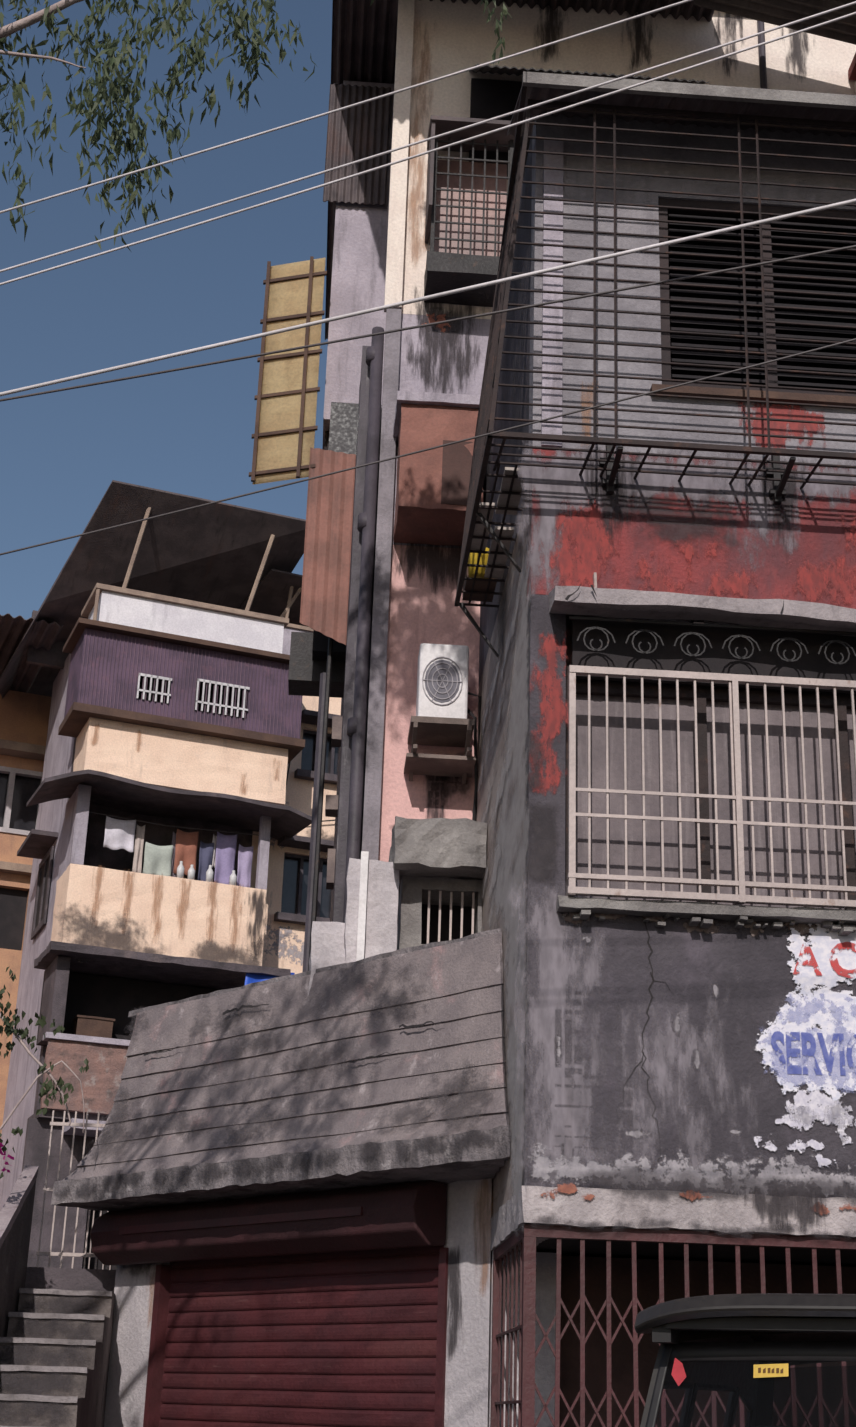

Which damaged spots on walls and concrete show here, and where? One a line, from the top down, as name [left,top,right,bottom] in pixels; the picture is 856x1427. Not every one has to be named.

leakage [716,13,743,74]
leakage [782,29,808,77]
leakage [408,297,478,393]
peeling [549,501,620,587]
peeling [636,541,717,594]
peeling [708,571,758,599]
peeling [793,516,856,606]
leakage [61,908,155,953]
leakage [196,891,269,966]
leakage [397,806,856,1228]
crack [616,918,676,1164]
spalling [540,1183,595,1200]